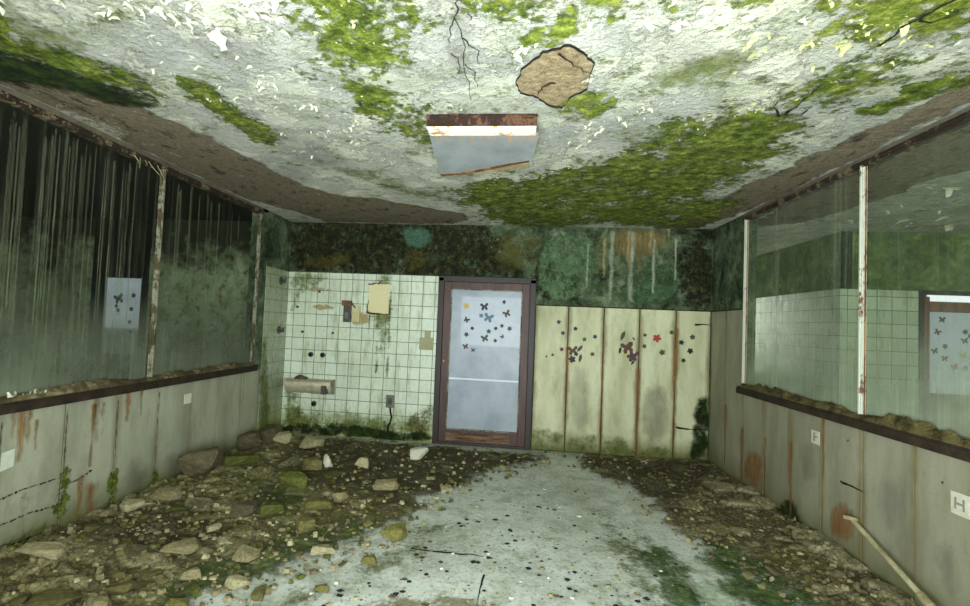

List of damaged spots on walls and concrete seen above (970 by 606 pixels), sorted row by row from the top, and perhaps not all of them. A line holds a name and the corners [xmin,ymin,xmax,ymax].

peeling [617,0,726,47]
crack [448,0,480,99]
flaking render [512,13,605,109]
peeling [94,0,433,182]
damp [48,103,127,138]
rust [12,411,38,459]
rust [832,508,851,537]